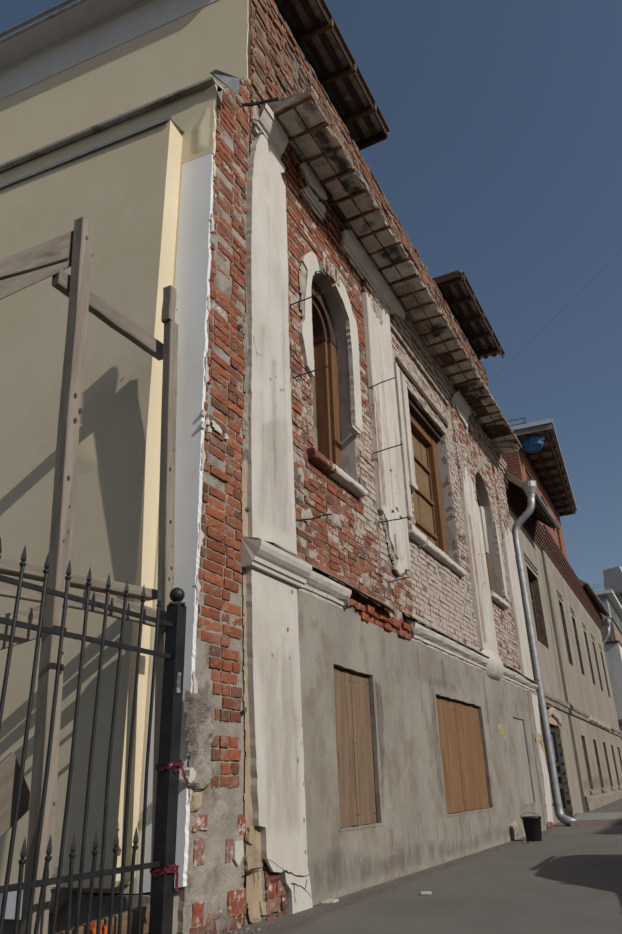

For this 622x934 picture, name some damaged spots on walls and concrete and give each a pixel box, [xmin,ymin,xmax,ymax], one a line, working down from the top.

spalling [239,286,250,537]
flaking render [349,598,411,640]
spalling [181,568,288,934]
crack [247,867,312,901]